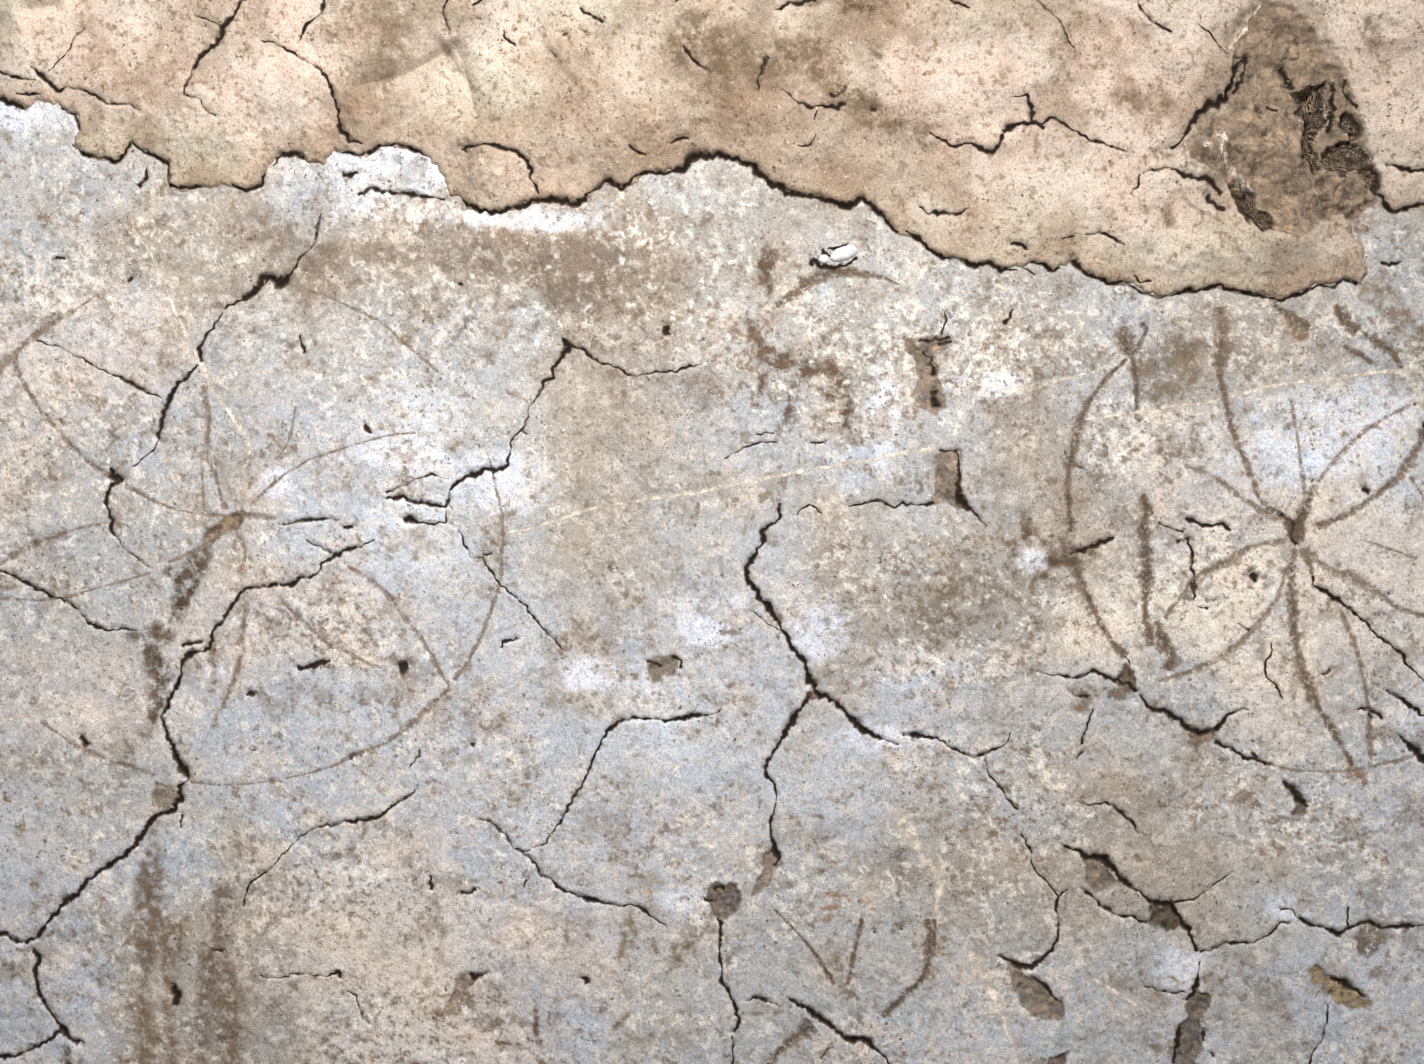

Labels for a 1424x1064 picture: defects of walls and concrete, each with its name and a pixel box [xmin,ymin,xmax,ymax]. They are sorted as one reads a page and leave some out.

crack [0,0,1402,302]
spalling [1170,6,1381,236]
crack [36,214,321,567]
crack [386,338,700,651]
spalling [905,312,952,414]
spalling [1051,558,1138,692]
spalling [1064,321,1148,532]
spalling [1137,494,1181,671]
crack [0,517,374,1060]
crack [479,709,721,925]
crack [744,498,1424,1000]
spalling [997,955,1064,1021]